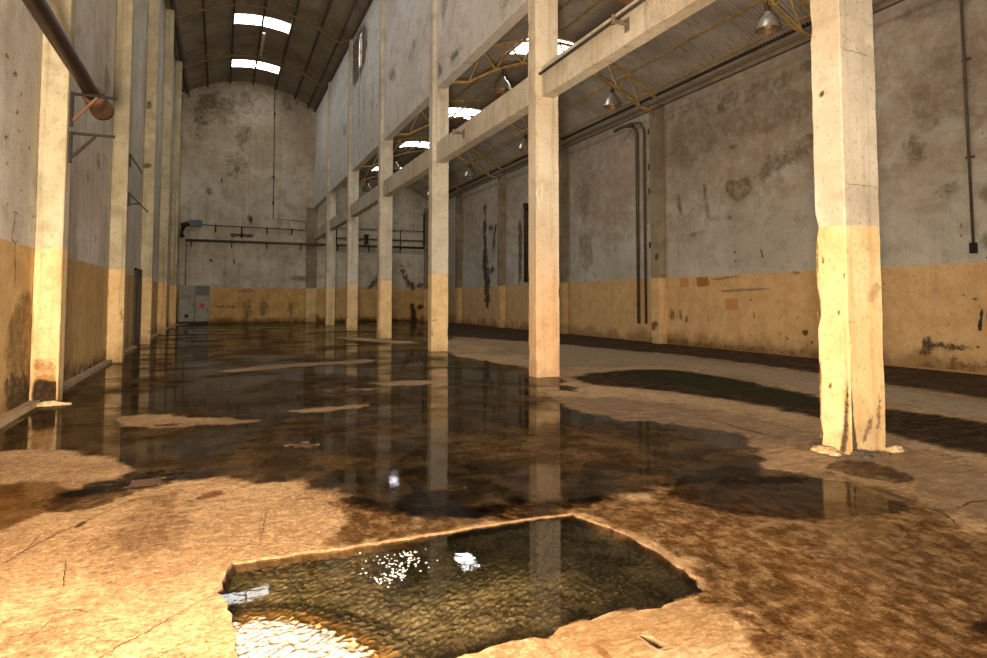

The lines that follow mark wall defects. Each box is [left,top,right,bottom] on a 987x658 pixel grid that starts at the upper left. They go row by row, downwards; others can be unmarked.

damp [482,204,496,308]
damp [920,337,985,371]
crack [99,593,218,658]
spalling [218,513,736,658]
damp [340,460,987,658]